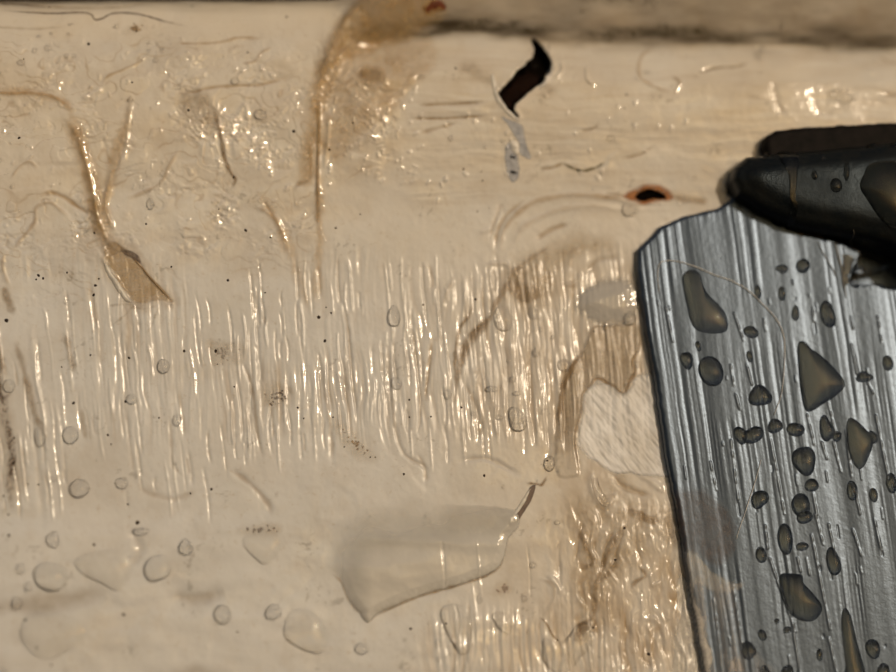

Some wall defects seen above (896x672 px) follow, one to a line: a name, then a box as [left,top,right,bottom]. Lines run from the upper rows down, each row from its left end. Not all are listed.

corrosion [624,185,673,204]
peeling [105,244,169,302]
peeling [558,324,668,476]